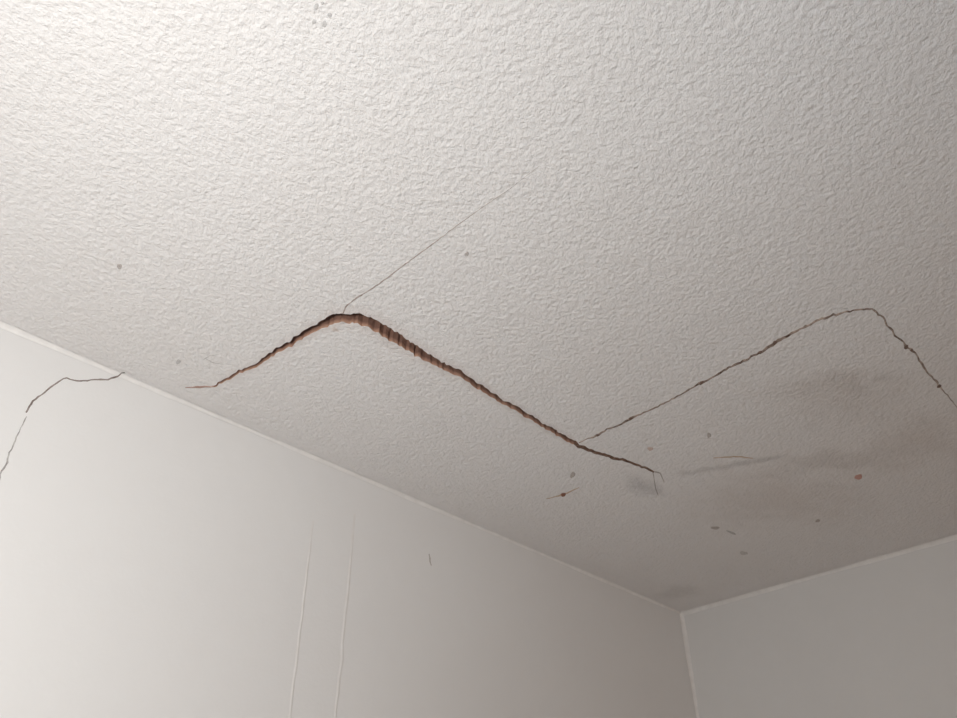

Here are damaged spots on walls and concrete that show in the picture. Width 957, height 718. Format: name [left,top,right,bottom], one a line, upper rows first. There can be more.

crack [0,372,125,479]
crack [185,166,957,473]